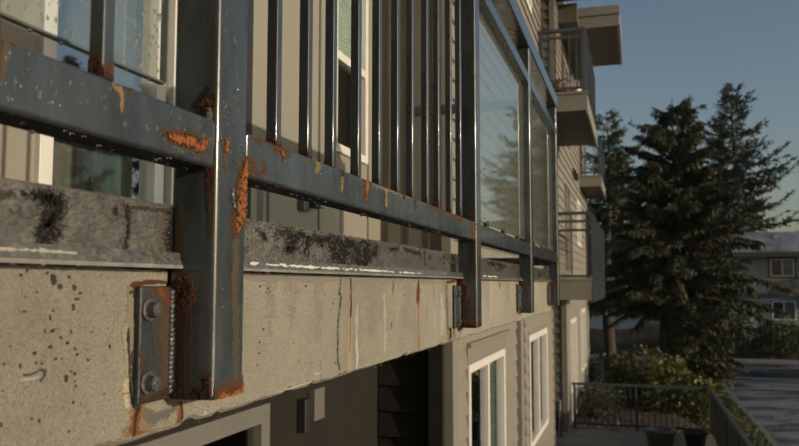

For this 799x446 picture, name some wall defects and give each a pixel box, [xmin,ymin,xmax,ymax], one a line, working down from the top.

rust [87,37,139,113]
rust [192,86,216,113]
mould [0,185,72,243]
rust [249,129,476,269]
rust [119,125,268,440]
crack [335,278,343,371]
rust [346,278,354,371]
water stain [244,225,461,369]
rust [446,279,477,341]